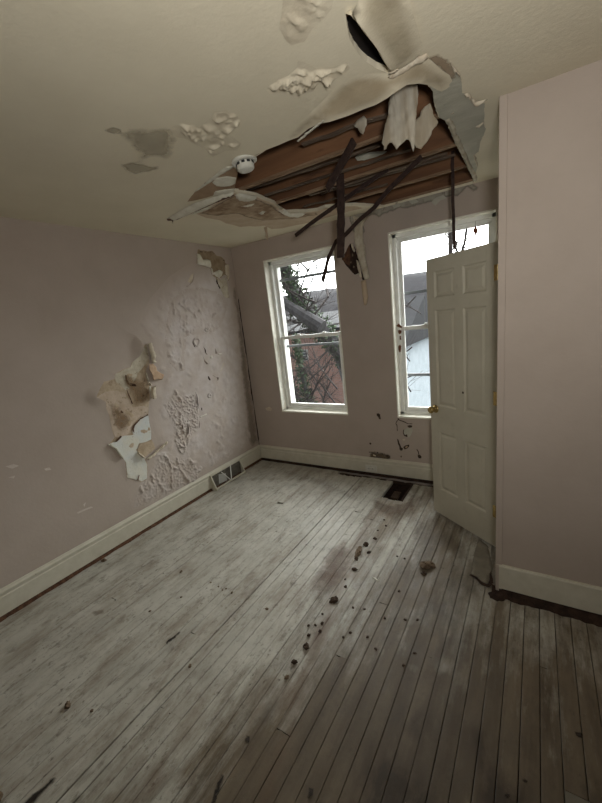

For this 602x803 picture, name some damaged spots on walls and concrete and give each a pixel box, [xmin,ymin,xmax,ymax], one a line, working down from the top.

spalling [347,15,386,65]
spalling [445,118,478,182]
peeling [197,249,230,298]
peeling [80,319,168,482]